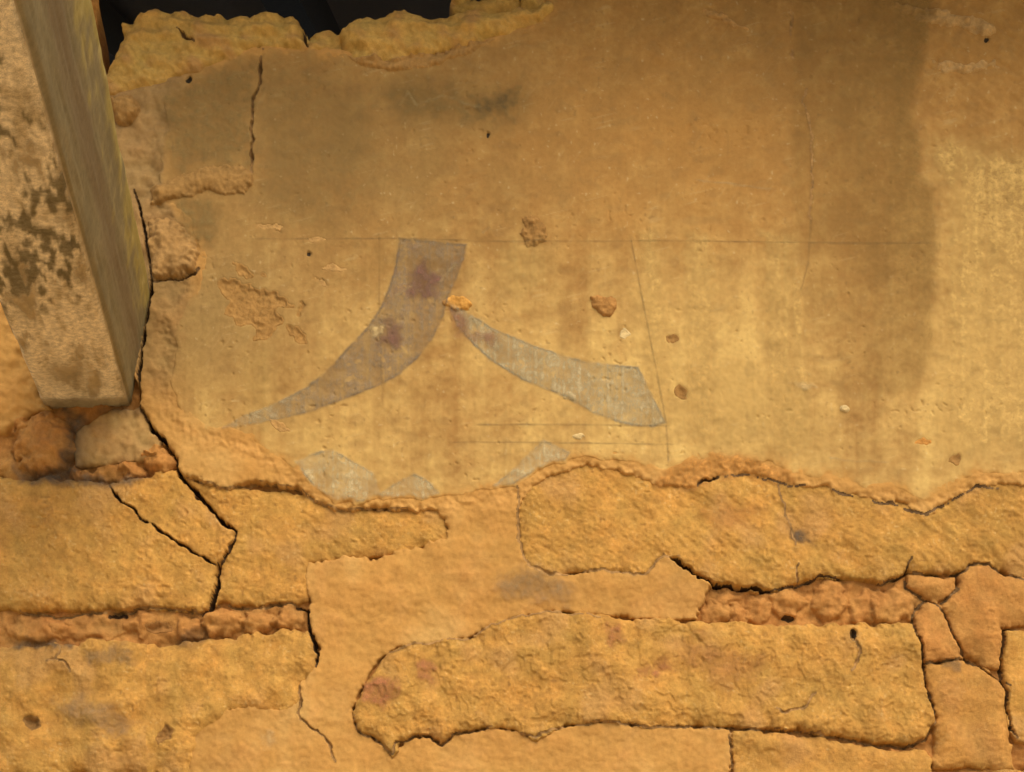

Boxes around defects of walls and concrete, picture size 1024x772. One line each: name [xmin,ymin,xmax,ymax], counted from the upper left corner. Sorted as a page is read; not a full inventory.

crack [249,48,264,173]
crack [20,189,408,762]
crack [516,473,840,595]
crack [832,484,999,516]
spalling [948,453,961,466]
crack [520,556,1024,769]
crack [354,714,492,755]